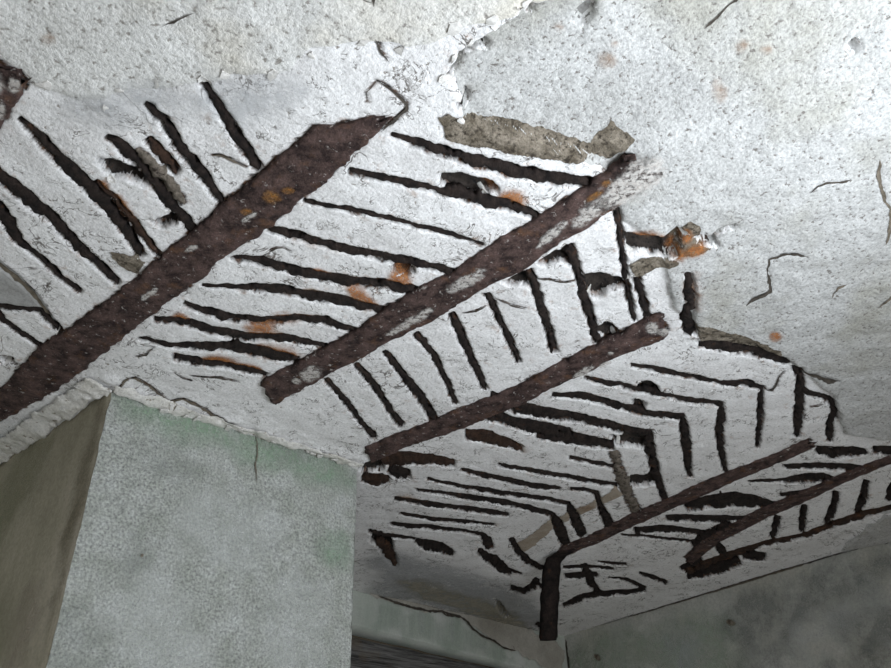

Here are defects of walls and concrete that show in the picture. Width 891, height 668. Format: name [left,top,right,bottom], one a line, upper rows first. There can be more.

crack [705,0,738,28]
rust [501,192,523,205]
crack [877,161,891,244]
spalling [0,0,891,441]
rust [668,226,705,260]
rust [390,263,411,285]
crack [747,253,809,305]
rust [247,321,273,334]
spalling [613,432,644,448]
spalling [627,466,655,484]
crack [379,596,515,651]
peeling [370,593,565,668]